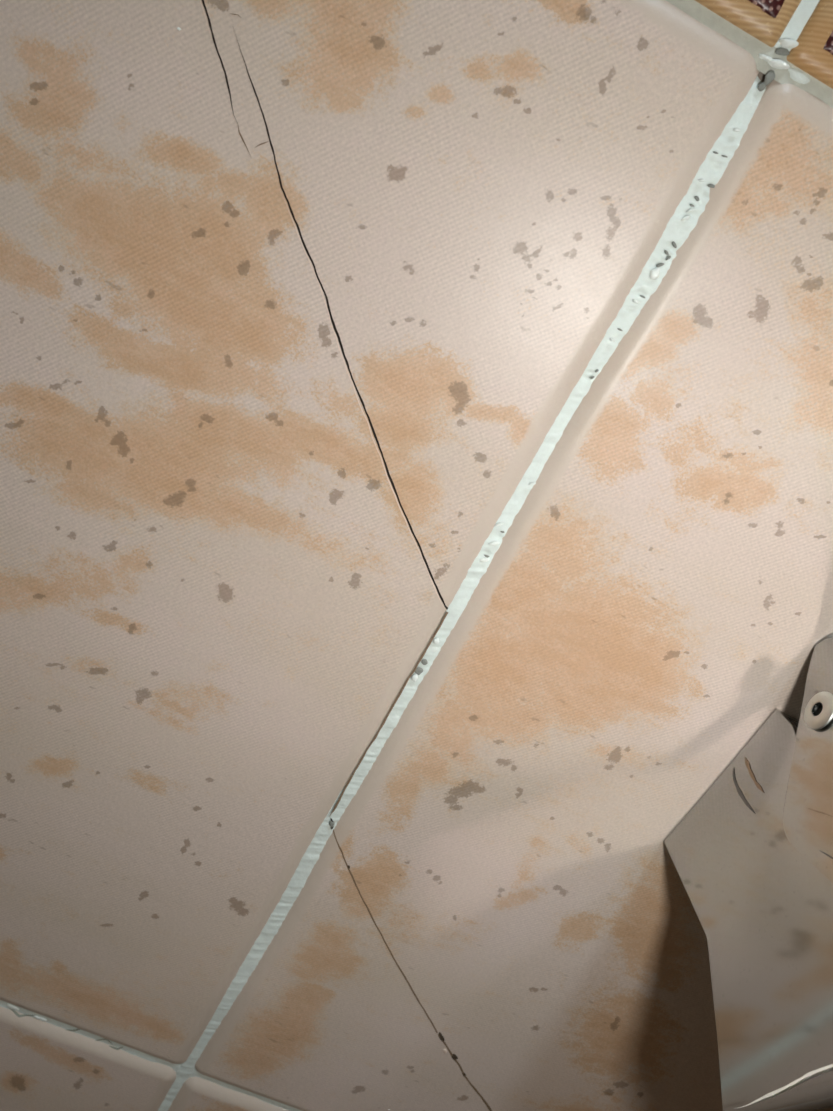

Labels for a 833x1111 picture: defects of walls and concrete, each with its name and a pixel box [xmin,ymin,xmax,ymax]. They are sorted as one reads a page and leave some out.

crack [200,0,492,1111]